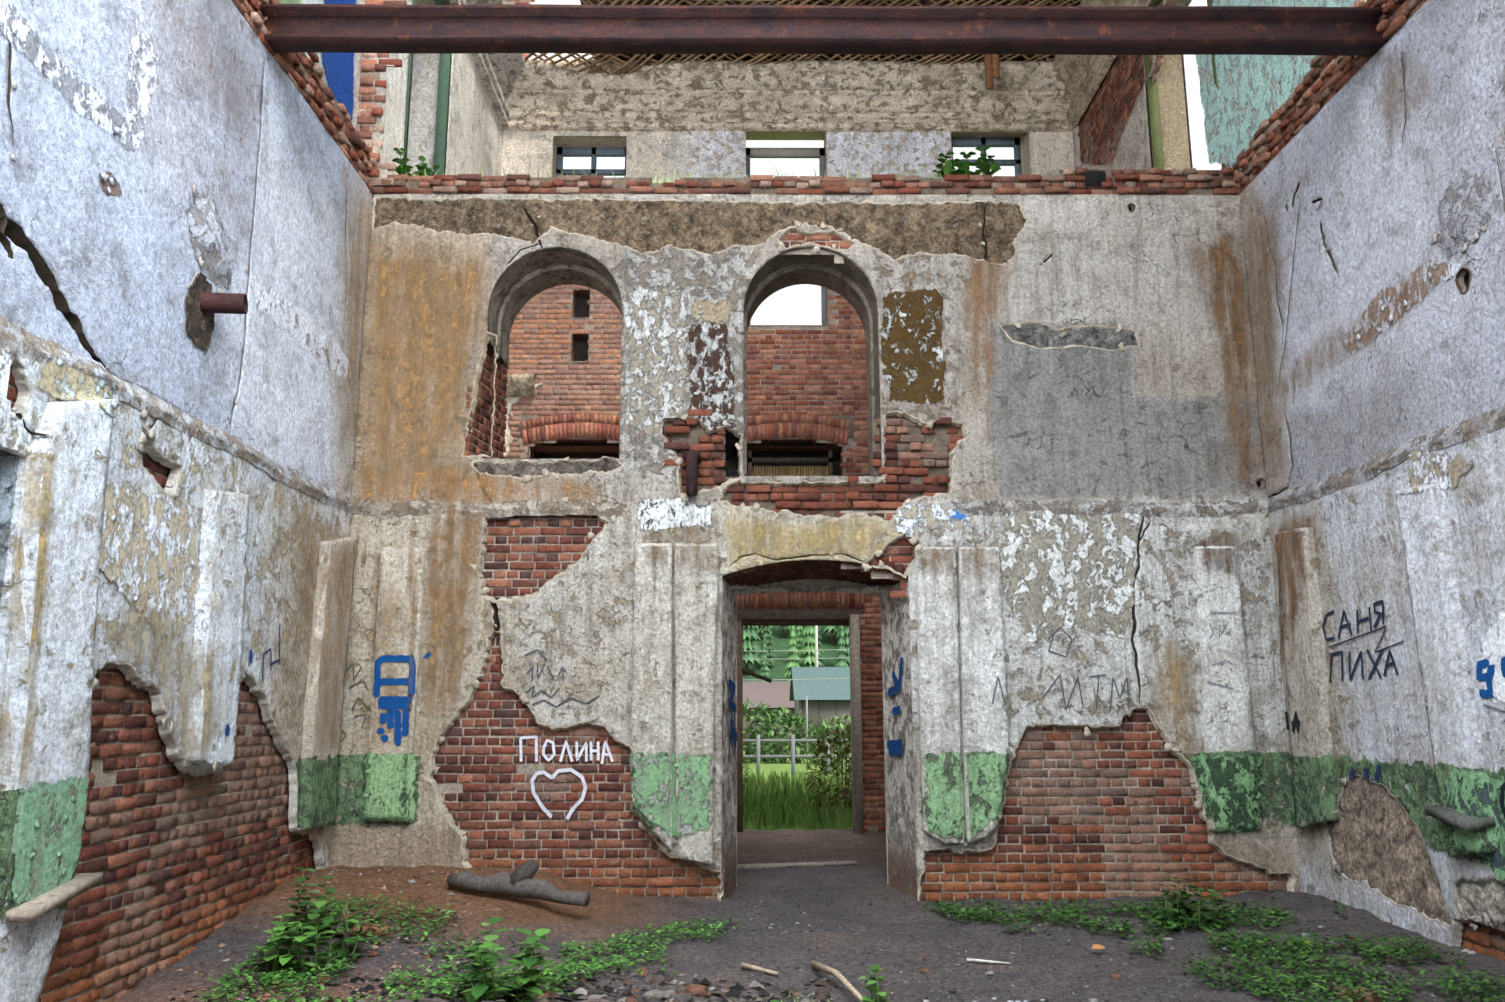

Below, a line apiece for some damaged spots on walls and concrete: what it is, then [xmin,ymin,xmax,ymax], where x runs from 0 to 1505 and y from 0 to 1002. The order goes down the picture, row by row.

crack [7,42,18,163]
crack [0,203,109,371]
spalling [462,331,623,482]
spalling [622,285,976,599]
spalling [471,497,615,603]
peeling [1000,510,1141,642]
crack [1131,516,1151,706]
spalling [11,660,326,1002]
spalling [363,629,724,901]
spalling [918,706,1296,901]
spalling [1321,768,1505,961]